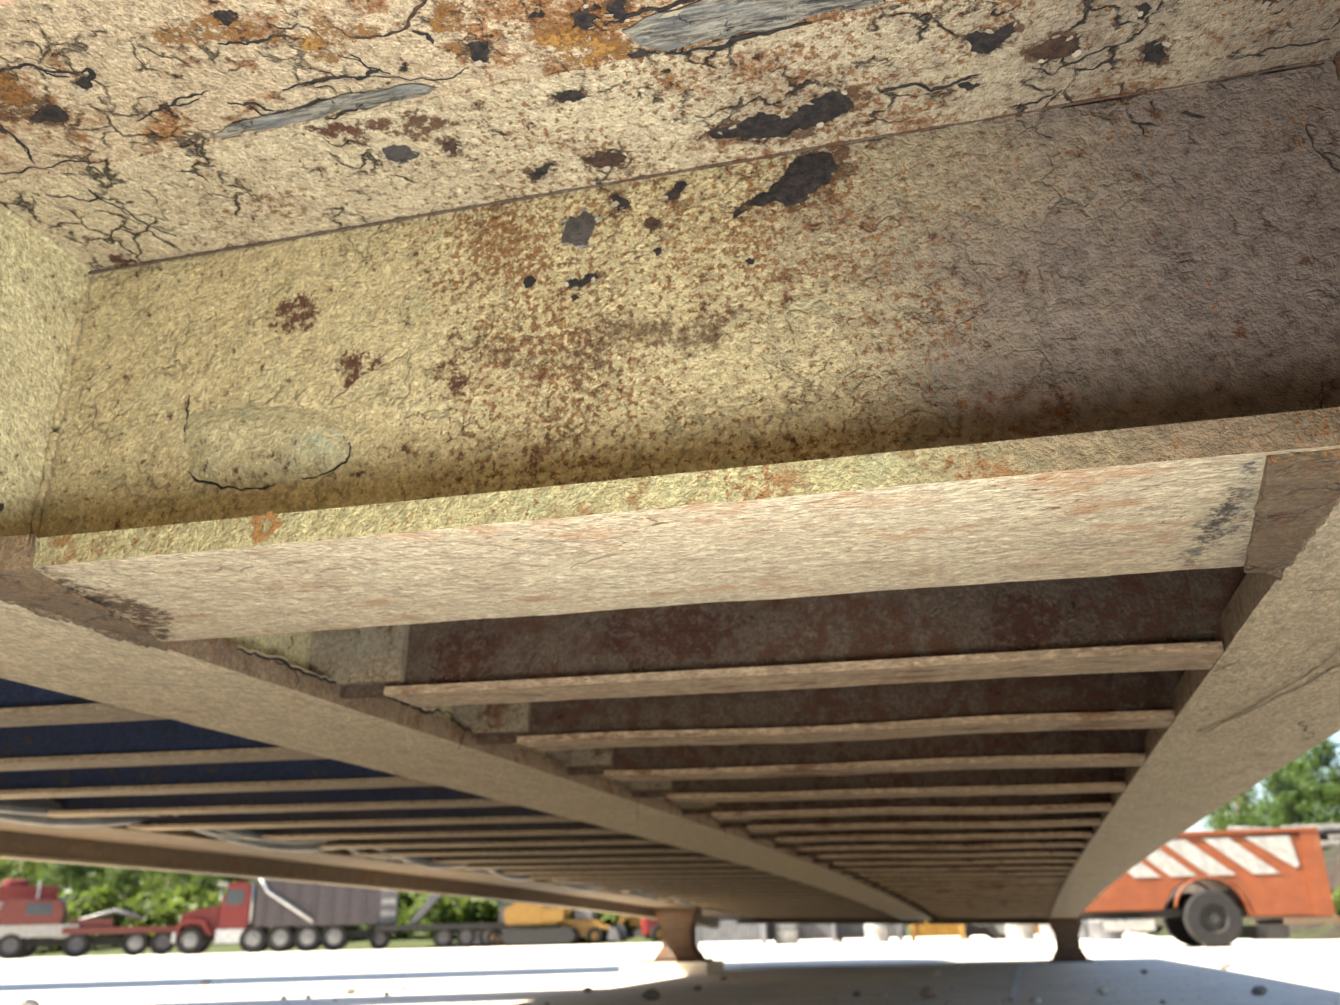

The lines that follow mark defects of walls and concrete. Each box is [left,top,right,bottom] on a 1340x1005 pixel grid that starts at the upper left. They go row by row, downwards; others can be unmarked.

corrosion [0,66,69,130]
crack [0,63,96,87]
crack [137,0,469,122]
corrosion [429,0,463,53]
corrosion [521,20,633,69]
crack [881,74,980,94]
crack [1032,45,1115,76]
spalling [692,86,873,219]
crack [0,125,177,236]
corrosion [269,290,319,335]
corrosion [249,511,282,544]